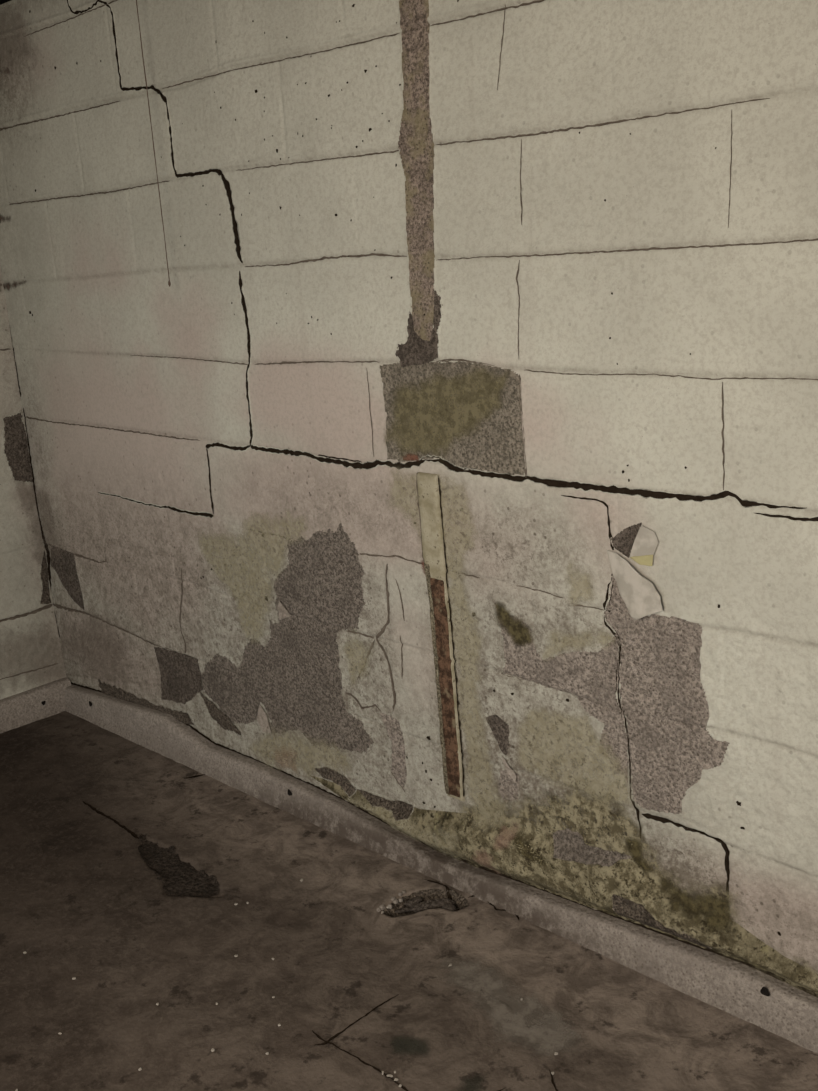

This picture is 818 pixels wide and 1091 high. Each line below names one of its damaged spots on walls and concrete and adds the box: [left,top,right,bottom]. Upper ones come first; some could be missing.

peeling [1,410,33,485]
crack [0,663,102,692]
peeling [39,544,86,611]
peeling [98,520,376,756]
peeling [315,711,415,821]
crack [333,553,422,711]
crack [0,0,818,654]
rust [403,454,465,802]
peeling [378,0,527,476]
crack [182,722,818,998]
peeling [491,520,732,816]
crack [501,574,730,927]